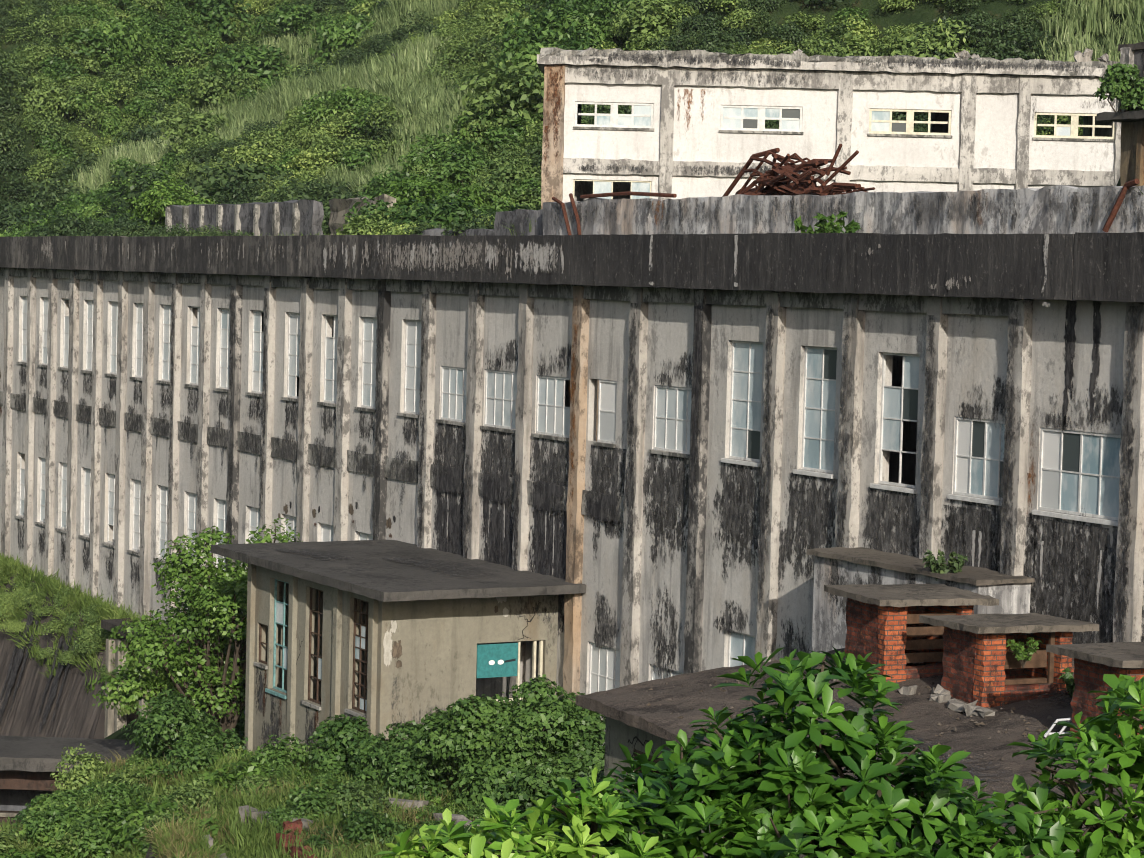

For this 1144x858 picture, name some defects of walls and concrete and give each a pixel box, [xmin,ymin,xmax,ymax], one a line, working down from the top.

rust [544,64,564,184]
leakage [579,164,648,173]
leakage [644,198,720,286]
leakage [1042,189,1143,307]
leakage [15,284,298,535]
leakage [312,292,571,579]
rust [568,296,578,527]
leakage [584,303,702,577]
leakage [713,309,883,635]
leakage [510,594,565,642]
leakage [594,592,619,649]
leakage [650,583,682,679]